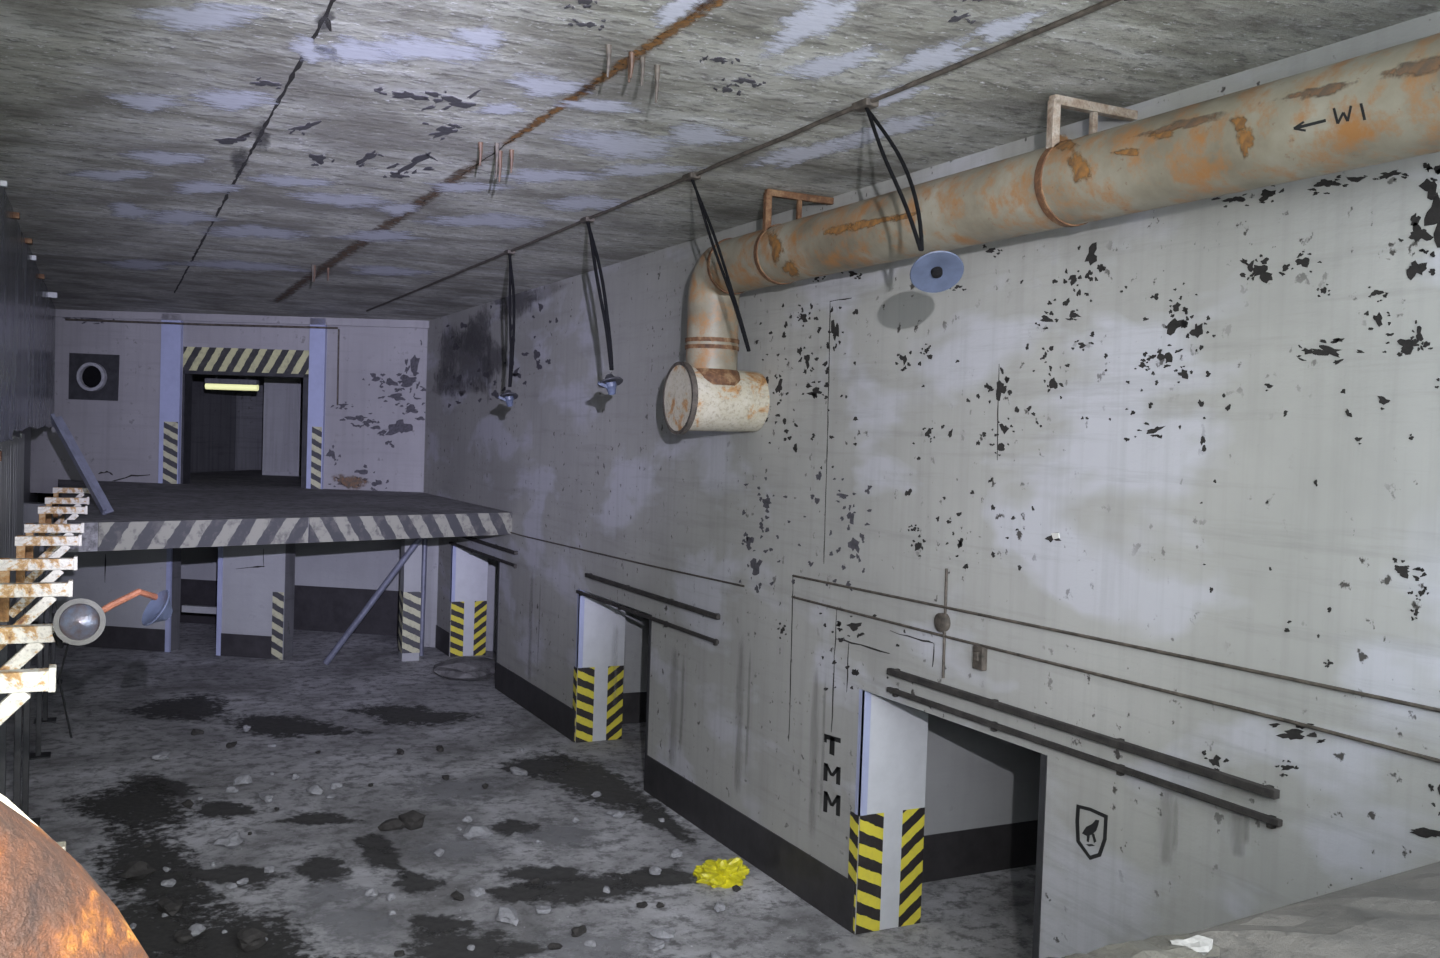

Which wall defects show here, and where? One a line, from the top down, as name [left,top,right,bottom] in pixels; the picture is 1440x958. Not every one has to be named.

corrosion [505,0,727,144]
crack [174,0,336,293]
peeling [1308,163,1440,280]
peeling [1240,251,1330,297]
peeling [755,303,858,452]
peeling [1297,338,1364,365]
peeling [1364,286,1433,357]
damp [119,773,256,819]
damp [169,855,353,890]
damp [276,812,446,895]
damp [491,819,540,836]
damp [398,914,551,958]